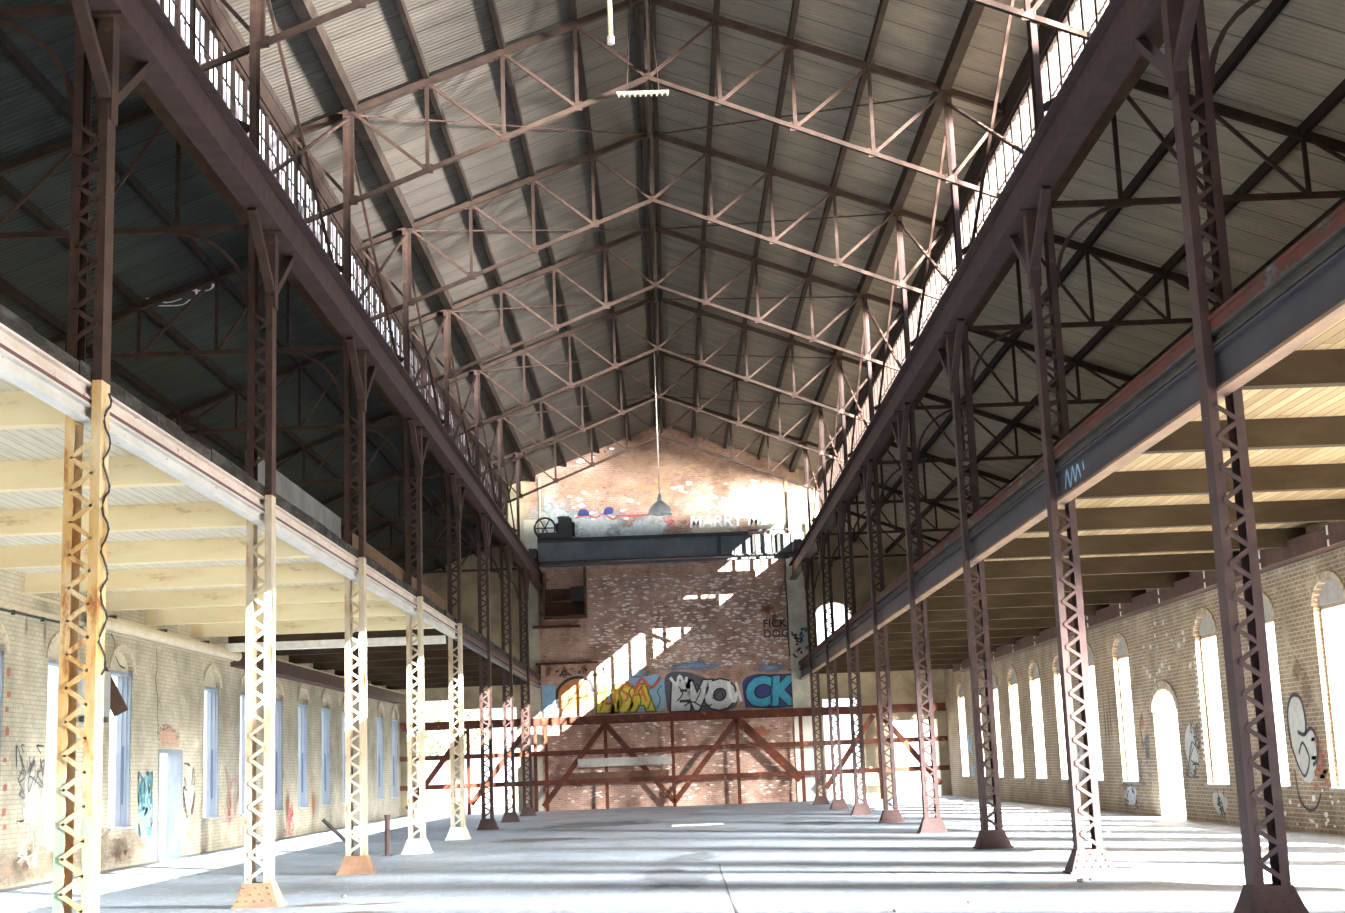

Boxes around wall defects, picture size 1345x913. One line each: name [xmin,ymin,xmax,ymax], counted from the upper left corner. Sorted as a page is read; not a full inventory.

rust [1210,210,1345,331]
rust [799,335,1195,665]
peeling [0,845,53,883]
peeling [100,828,144,867]
crack [719,864,774,913]